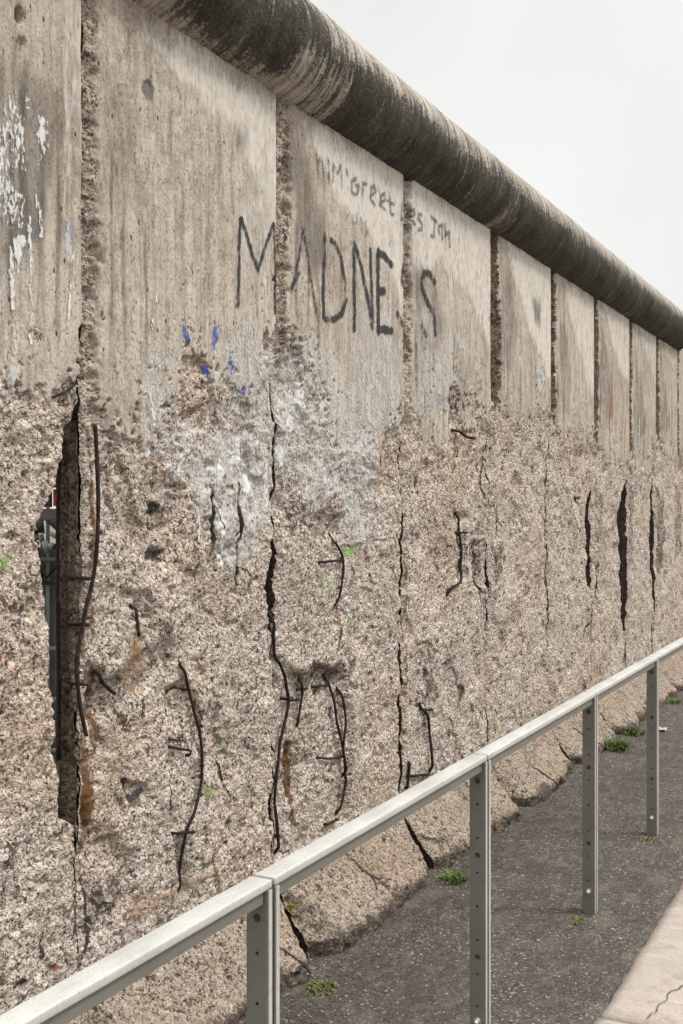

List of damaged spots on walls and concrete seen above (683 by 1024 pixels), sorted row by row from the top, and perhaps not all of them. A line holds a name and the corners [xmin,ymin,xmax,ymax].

crack [209,481,253,585]
spalling [0,0,491,1015]
spalling [483,234,683,745]
corrosion [79,596,105,848]
corrosion [272,715,308,821]